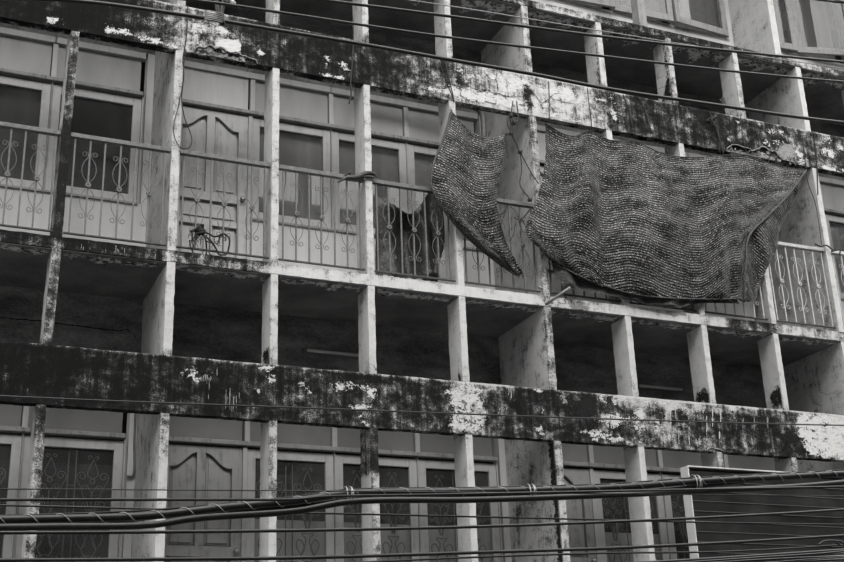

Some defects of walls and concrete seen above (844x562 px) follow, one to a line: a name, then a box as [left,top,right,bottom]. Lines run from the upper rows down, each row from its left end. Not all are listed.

damp [662,45,672,102]
damp [521,84,535,112]
damp [574,394,597,417]
damp [648,384,805,456]
peeling [795,412,844,460]
damp [548,442,556,485]
damp [553,500,562,562]